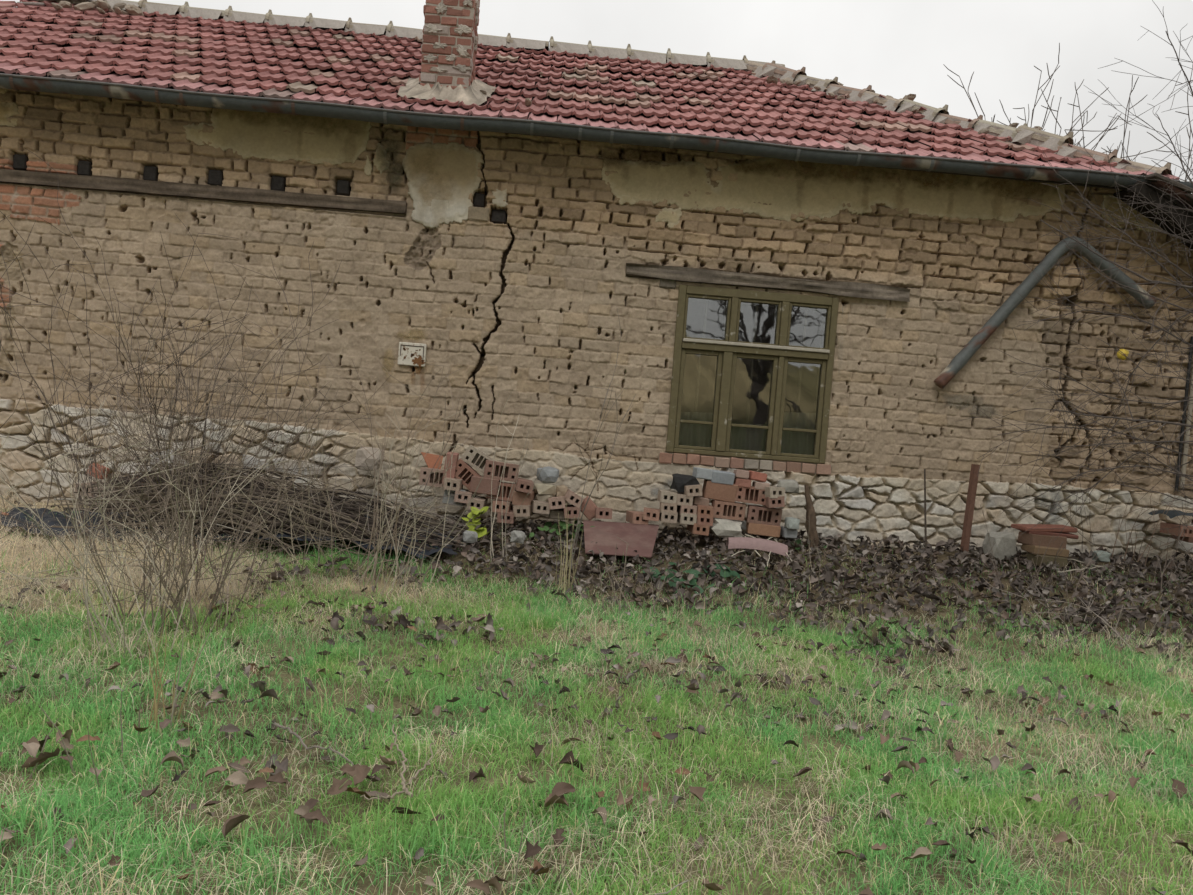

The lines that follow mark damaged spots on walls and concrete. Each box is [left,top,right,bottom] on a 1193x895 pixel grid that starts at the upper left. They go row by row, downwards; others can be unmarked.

flaking render [183,108,508,270]
crack [477,131,489,196]
flaking render [598,155,1066,229]
spalling [0,241,27,287]
spalling [0,301,18,383]
crack [444,223,515,457]
crack [1050,187,1092,469]